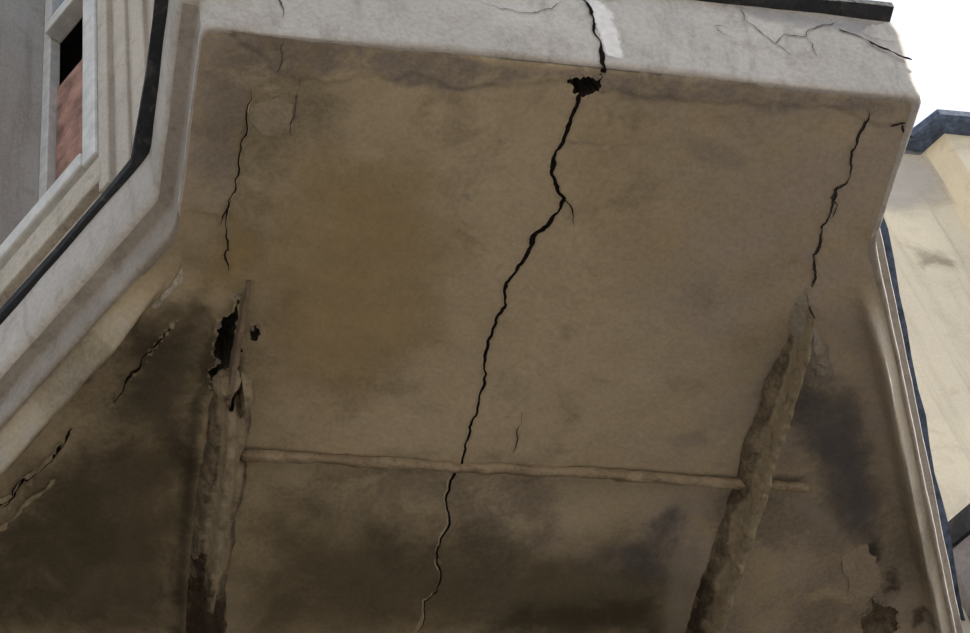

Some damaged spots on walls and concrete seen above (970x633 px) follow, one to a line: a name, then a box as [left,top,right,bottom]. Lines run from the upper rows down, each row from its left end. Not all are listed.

crack [277,42,301,136]
crack [715,10,912,60]
crack [221,87,253,271]
crack [811,112,913,287]
crack [113,328,170,403]
spalling [207,292,266,418]
crack [417,0,607,632]
crack [0,428,72,508]
water stain [0,309,203,632]
peeling [841,542,903,633]